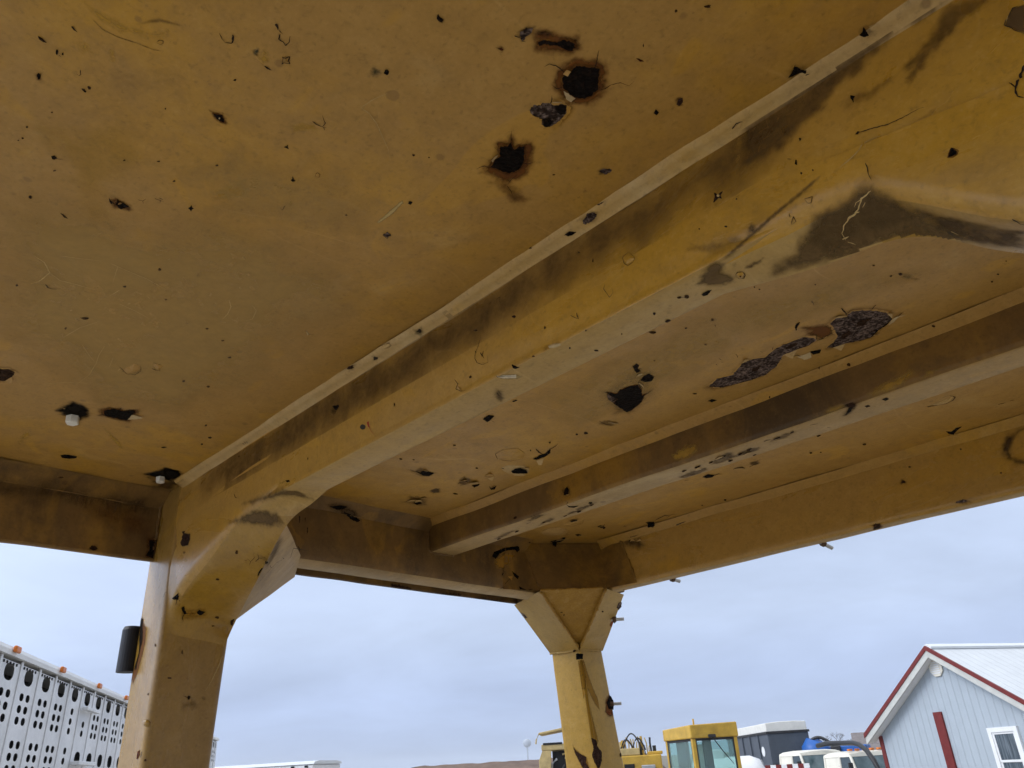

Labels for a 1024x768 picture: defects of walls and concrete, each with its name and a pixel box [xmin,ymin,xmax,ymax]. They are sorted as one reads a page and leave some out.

peeling [1004,5,1024,32]
peeling [525,91,575,129]
crack [842,163,871,244]
damp [775,190,1024,273]
peeling [707,305,905,402]